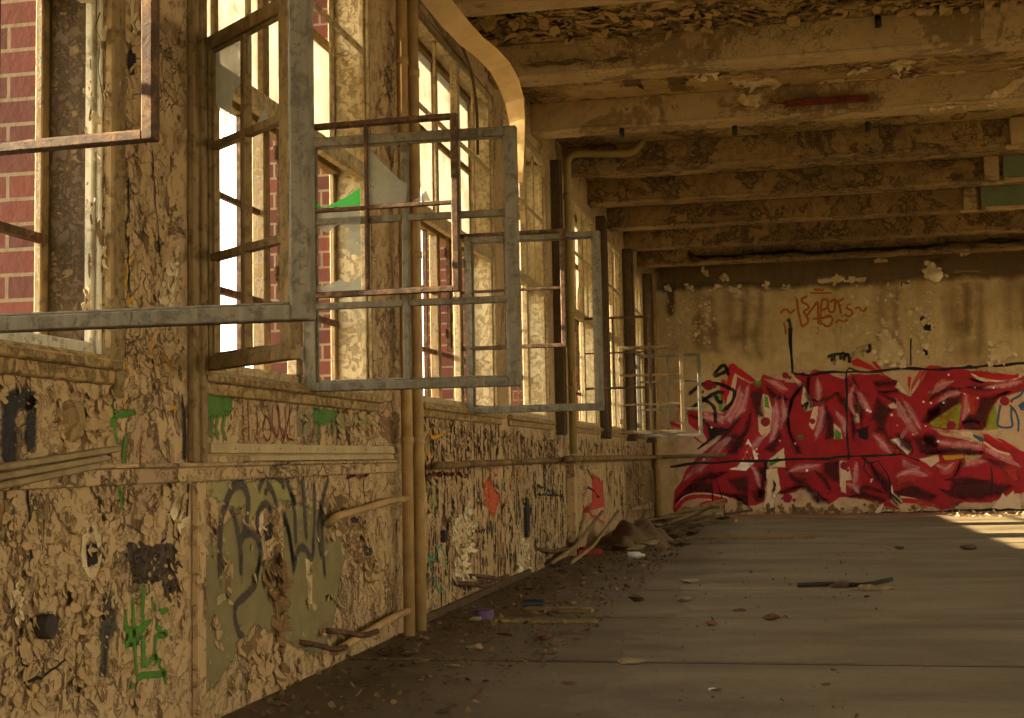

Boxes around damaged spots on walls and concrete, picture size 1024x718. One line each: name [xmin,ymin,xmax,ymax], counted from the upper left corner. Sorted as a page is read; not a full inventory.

peeling [83,0,141,134]
peeling [81,148,108,310]
flaking render [0,328,186,464]
peeling [334,403,401,449]
peeling [0,476,402,718]